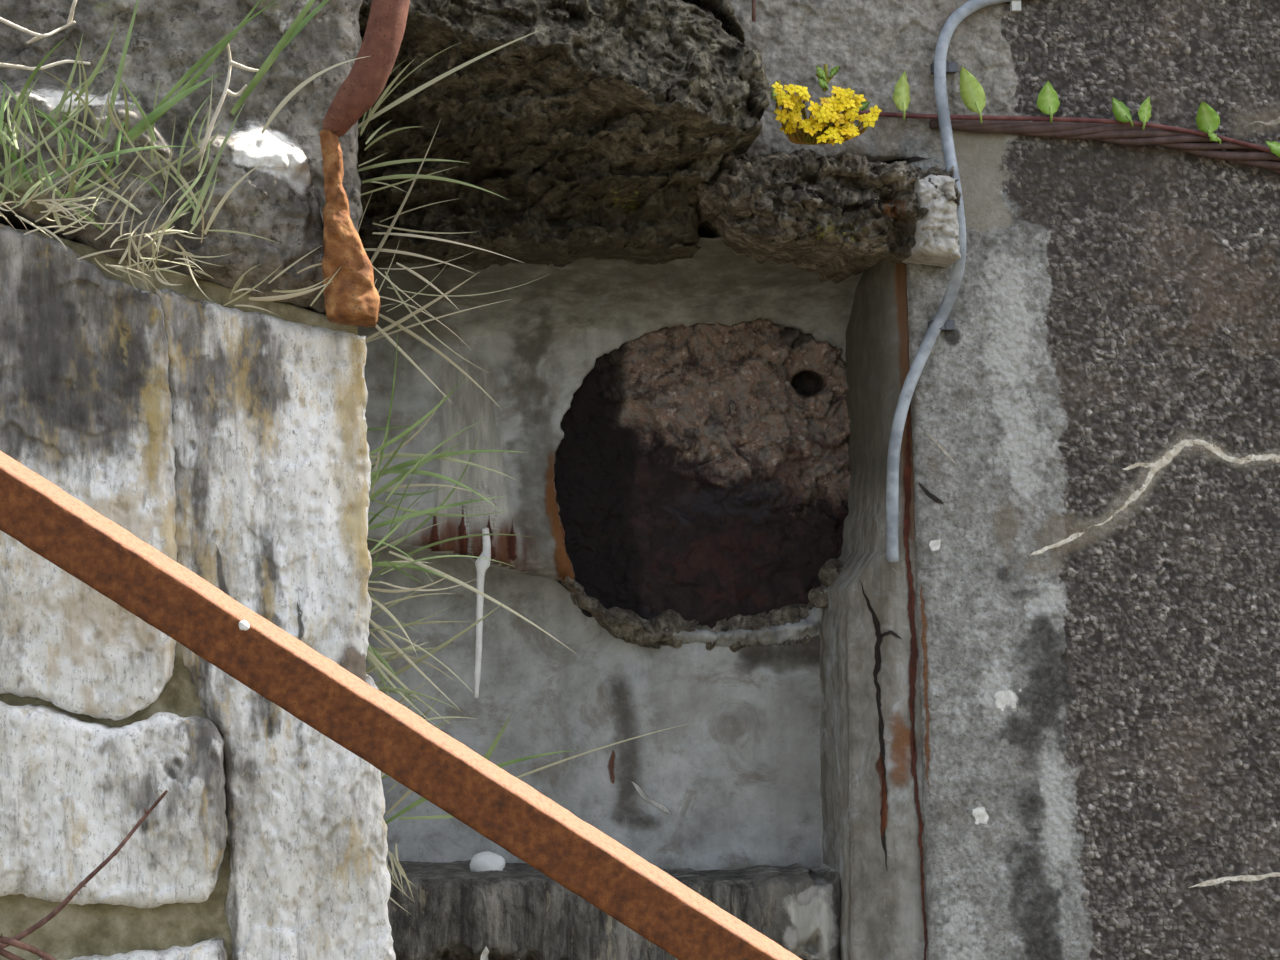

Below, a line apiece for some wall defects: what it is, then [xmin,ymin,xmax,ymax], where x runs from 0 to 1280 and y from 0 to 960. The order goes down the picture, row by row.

crack [1244,117,1280,127]
corrosion [419,510,527,572]
corrosion [546,472,574,580]
crack [1029,432,1280,556]
crack [860,581,902,868]
corrosion [891,405,930,960]
water stain [1004,616,1072,753]
water stain [1009,793,1062,960]